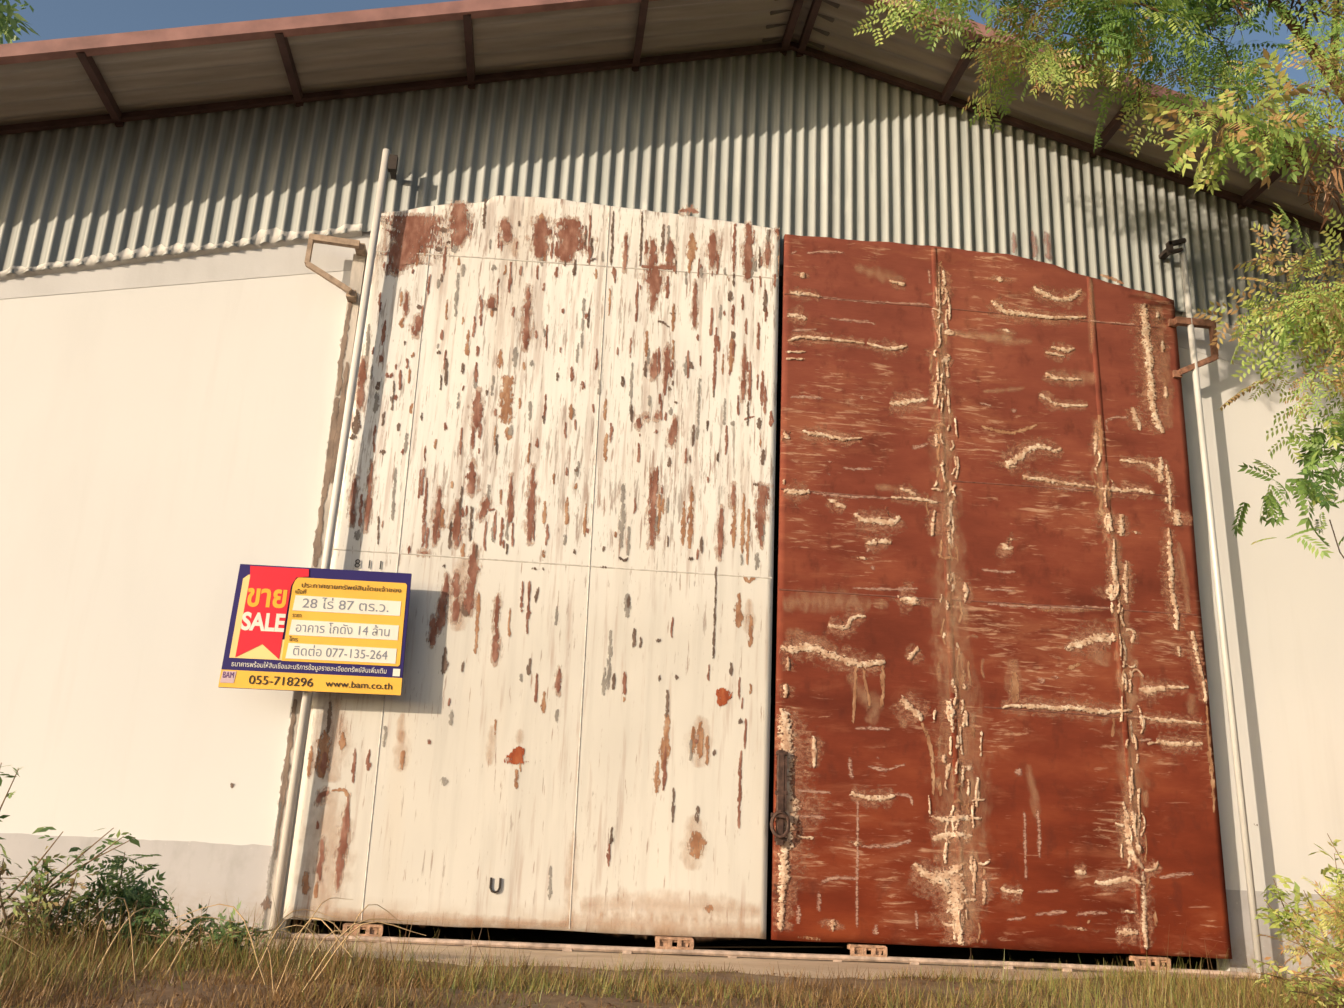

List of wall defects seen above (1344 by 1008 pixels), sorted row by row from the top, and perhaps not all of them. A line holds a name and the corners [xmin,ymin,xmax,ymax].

rust [1012,231,1051,259]
rust [982,424,1038,435]
rust [348,200,780,829]
rust [301,702,387,898]
rust [687,806,707,859]